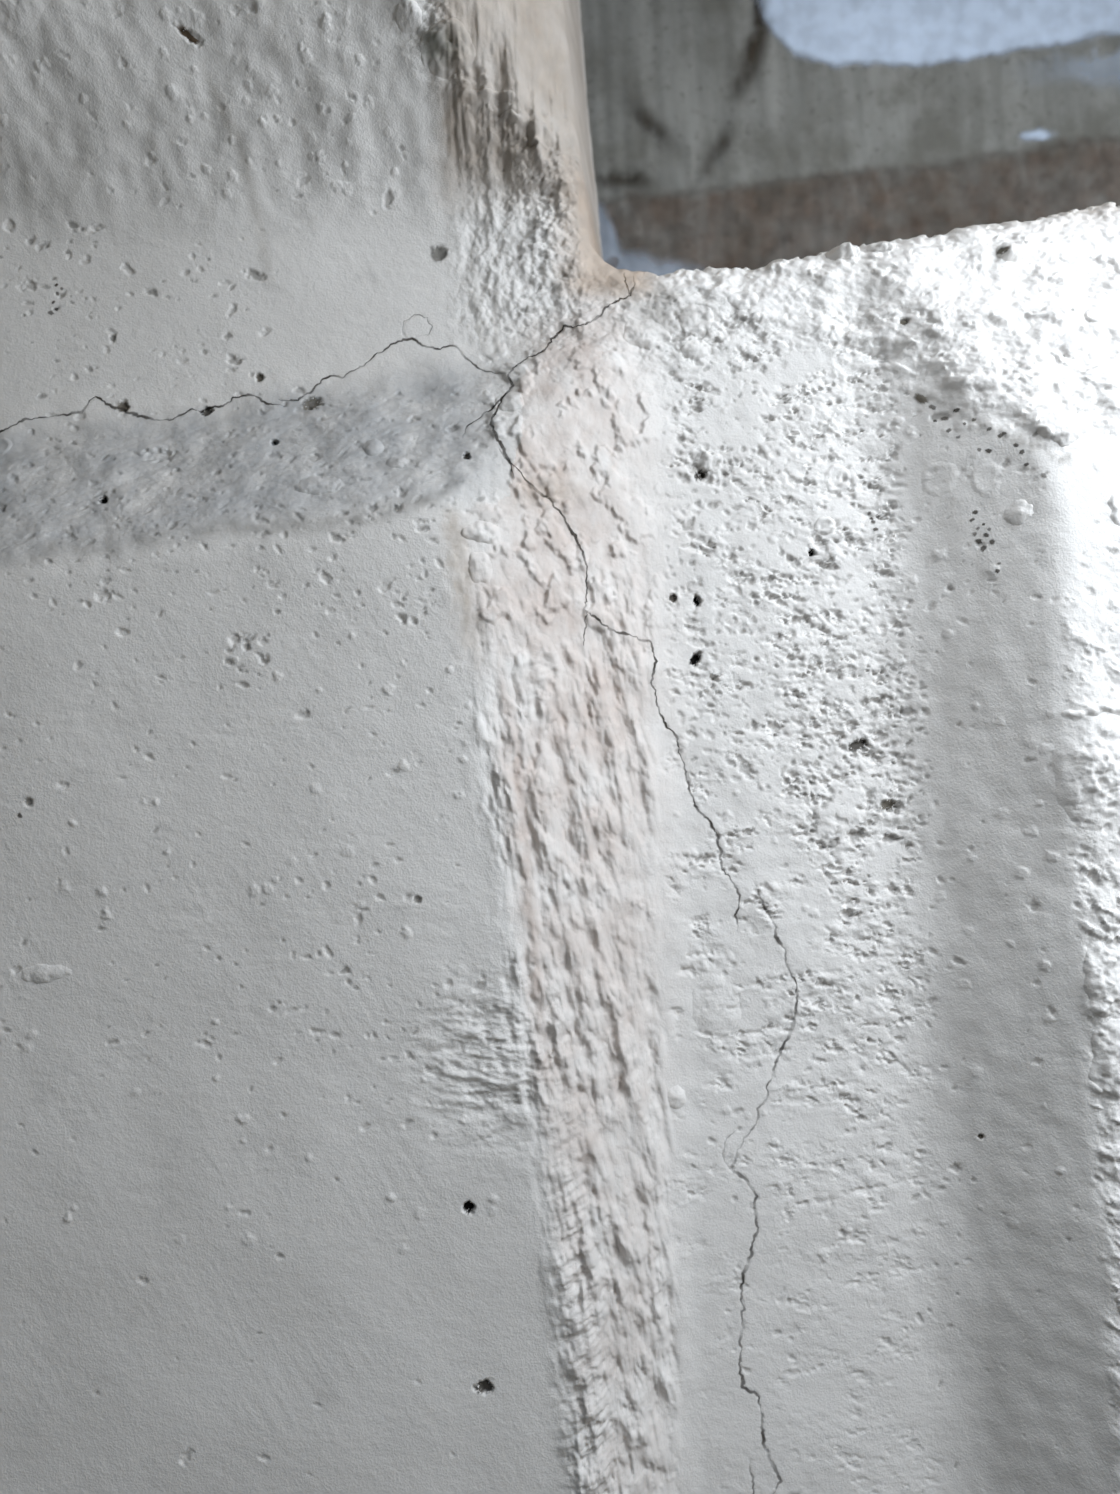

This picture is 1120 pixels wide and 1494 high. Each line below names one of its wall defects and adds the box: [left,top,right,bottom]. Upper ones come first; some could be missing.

crack [0,277,798,1091]
crack [738,1174,759,1290]
crack [739,1343,781,1494]